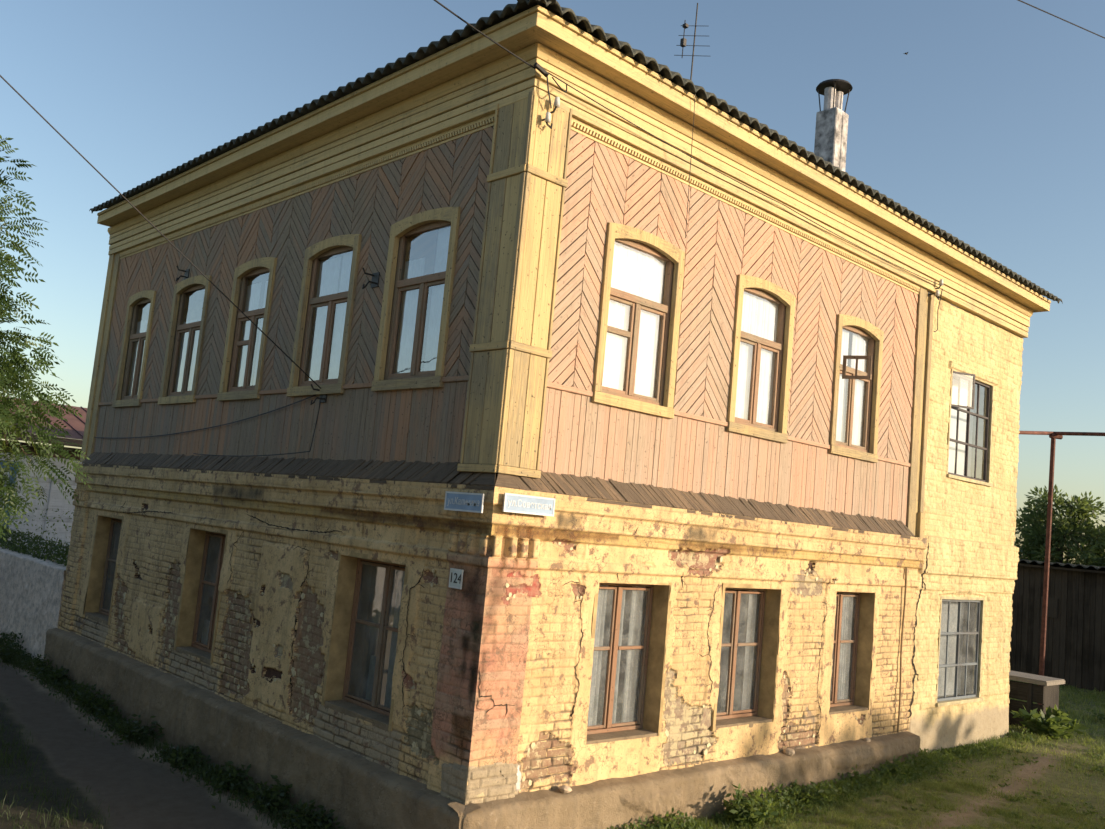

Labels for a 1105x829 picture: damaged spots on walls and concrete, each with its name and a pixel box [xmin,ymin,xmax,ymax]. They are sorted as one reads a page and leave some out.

spalling [219,571,326,729]
crack [399,569,424,712]
peeling [502,571,542,605]
spalling [668,543,731,578]
crack [907,536,929,728]
spalling [517,732,577,793]
spalling [660,666,718,767]
spalling [777,671,820,749]